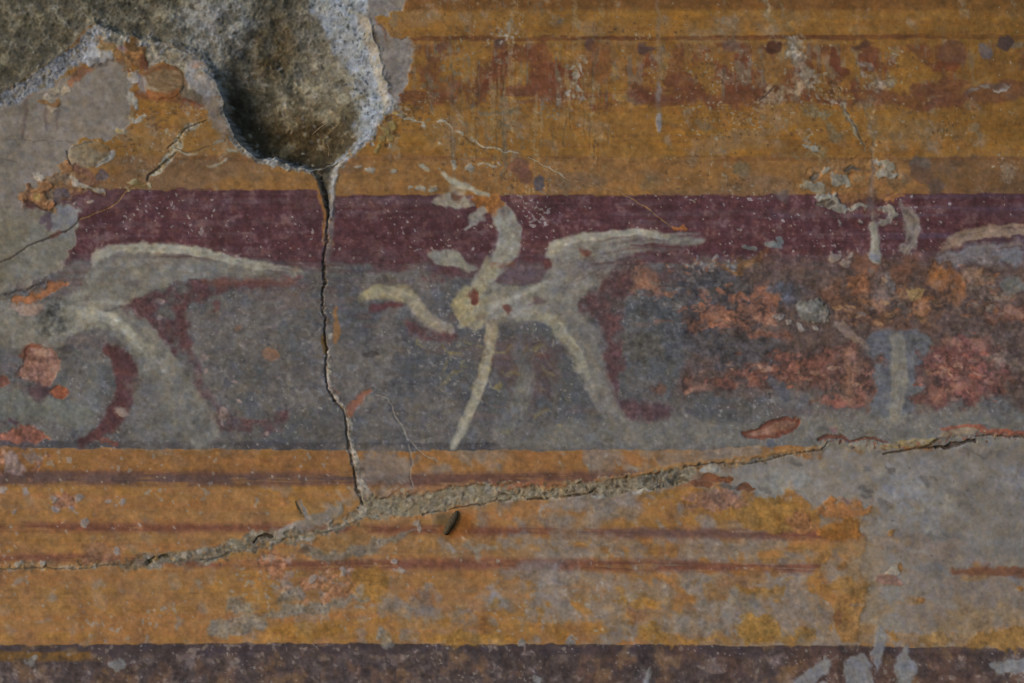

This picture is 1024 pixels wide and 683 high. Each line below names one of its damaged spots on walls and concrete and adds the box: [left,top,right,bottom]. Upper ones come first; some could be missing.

crack [0,120,238,265]
spalling [0,0,414,321]
crack [403,116,688,232]
crack [0,158,1024,572]
spalling [688,280,789,339]
spalling [688,345,889,412]
peeling [828,249,853,268]
spalling [836,268,968,336]
spalling [912,336,1012,410]
flaking render [696,439,1024,649]